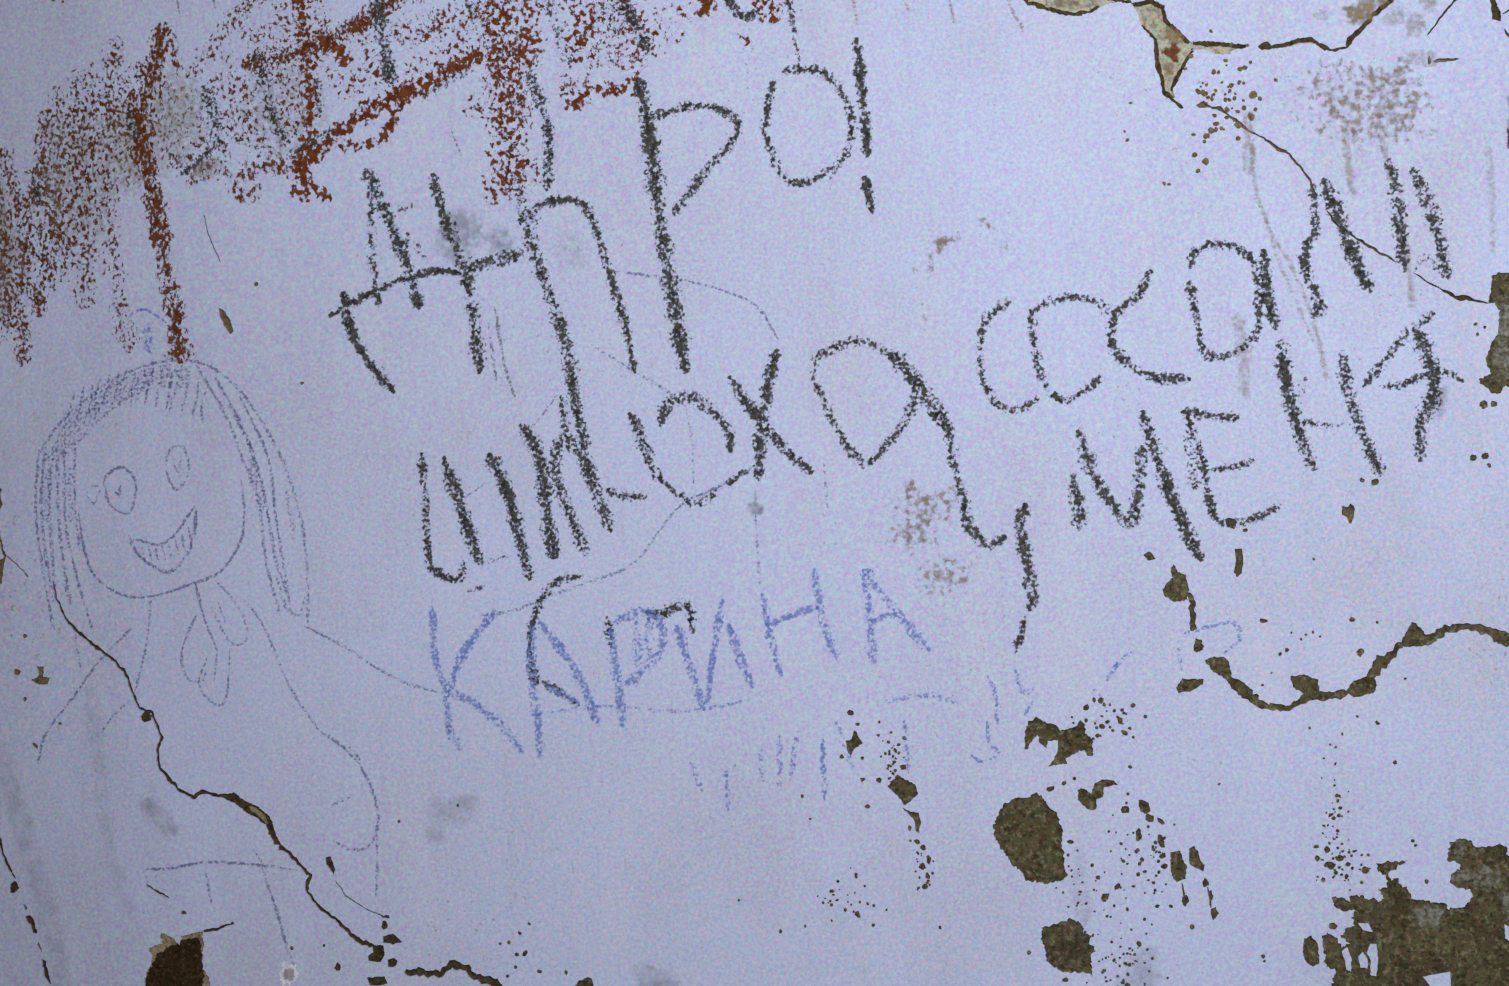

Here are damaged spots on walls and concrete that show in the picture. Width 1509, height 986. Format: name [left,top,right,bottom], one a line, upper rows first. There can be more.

crack [1427,0,1509,64]
crack [1024,0,1487,304]
peeling [1473,272,1509,409]
crack [1162,564,1509,712]
crack [0,488,503,986]
flaking render [1024,717,1093,766]
flaking render [993,786,1074,884]
flaking render [144,922,234,986]
flaking render [1041,918,1095,975]
flaking render [1303,838,1509,986]